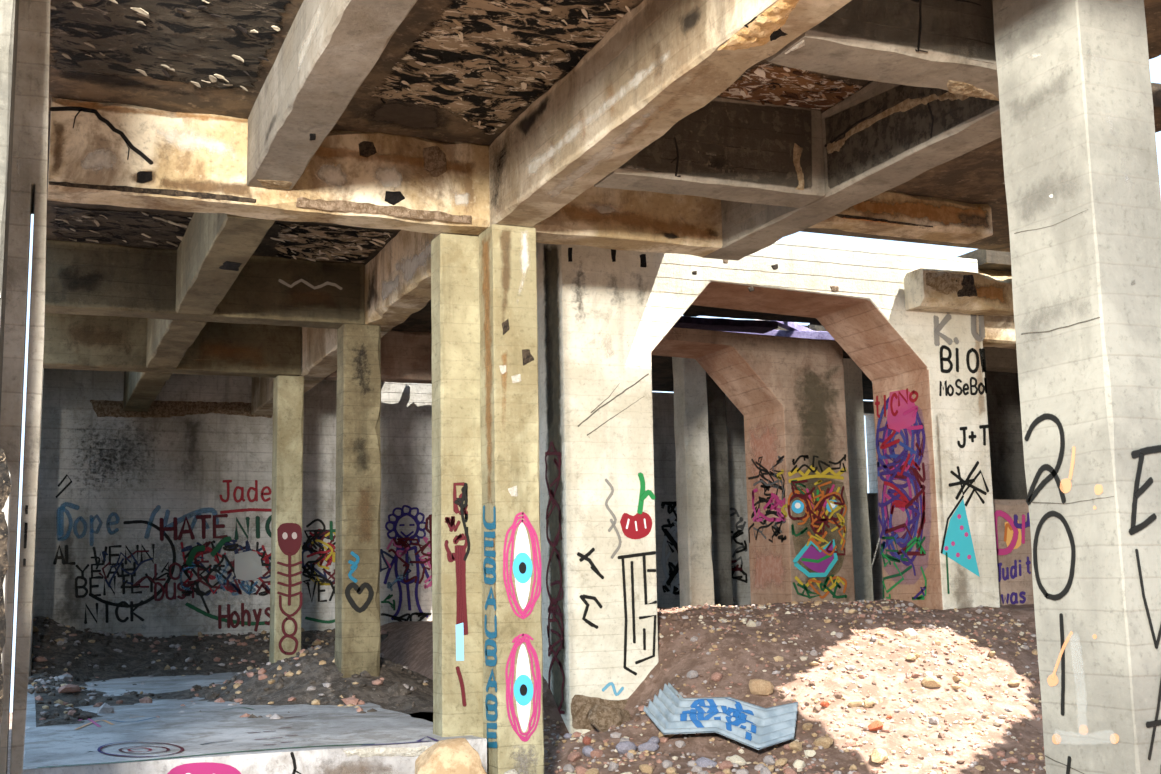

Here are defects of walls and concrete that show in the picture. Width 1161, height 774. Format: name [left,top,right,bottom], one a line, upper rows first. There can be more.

peeling [50,0,290,95]
peeling [371,0,643,135]
peeling [717,0,863,113]
crack [50,106,153,165]
peeling [49,206,192,248]
spalling [49,171,256,203]
peeling [271,223,392,263]
spalling [257,179,472,223]
spalling [0,448,11,722]
crack [290,752,301,774]